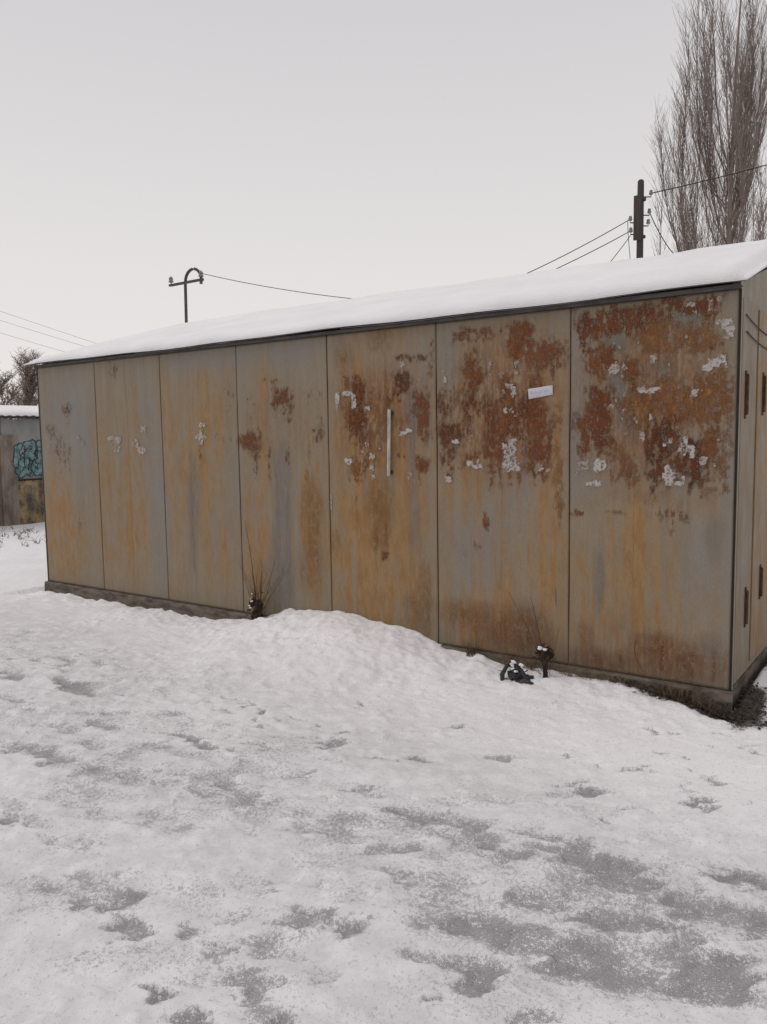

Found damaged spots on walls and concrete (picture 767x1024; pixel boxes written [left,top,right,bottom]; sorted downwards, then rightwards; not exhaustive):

rust [342,294,735,519]